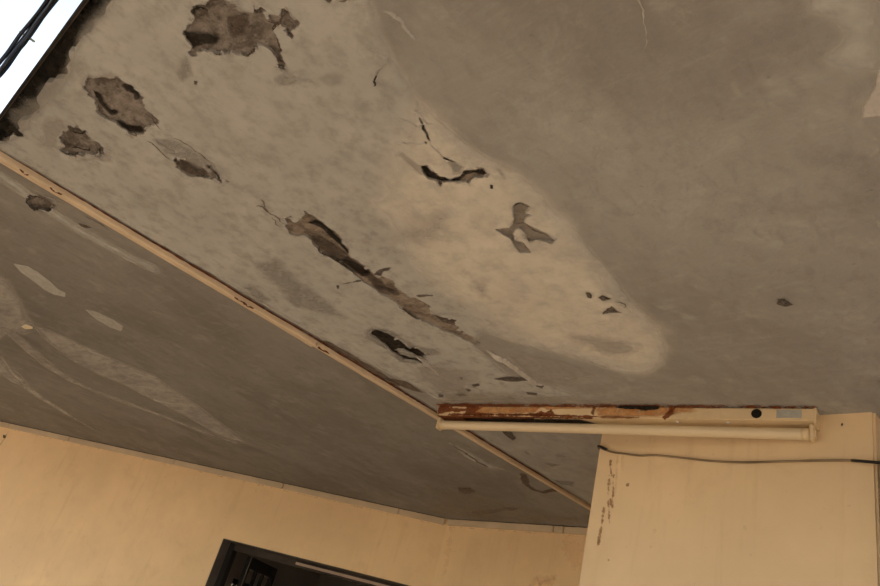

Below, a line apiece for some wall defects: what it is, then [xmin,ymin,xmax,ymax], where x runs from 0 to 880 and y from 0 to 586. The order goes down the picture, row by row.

spalling [0,0,111,141]
flaking render [43,121,111,160]
flaking render [82,76,228,184]
flaking render [179,0,300,85]
flaking render [391,105,493,189]
peeling [863,70,880,117]
flaking render [25,195,55,212]
flaking render [498,202,556,251]
flaking render [256,199,480,345]
water stain [324,341,423,393]
flaking render [366,329,440,377]
rust [0,150,817,494]